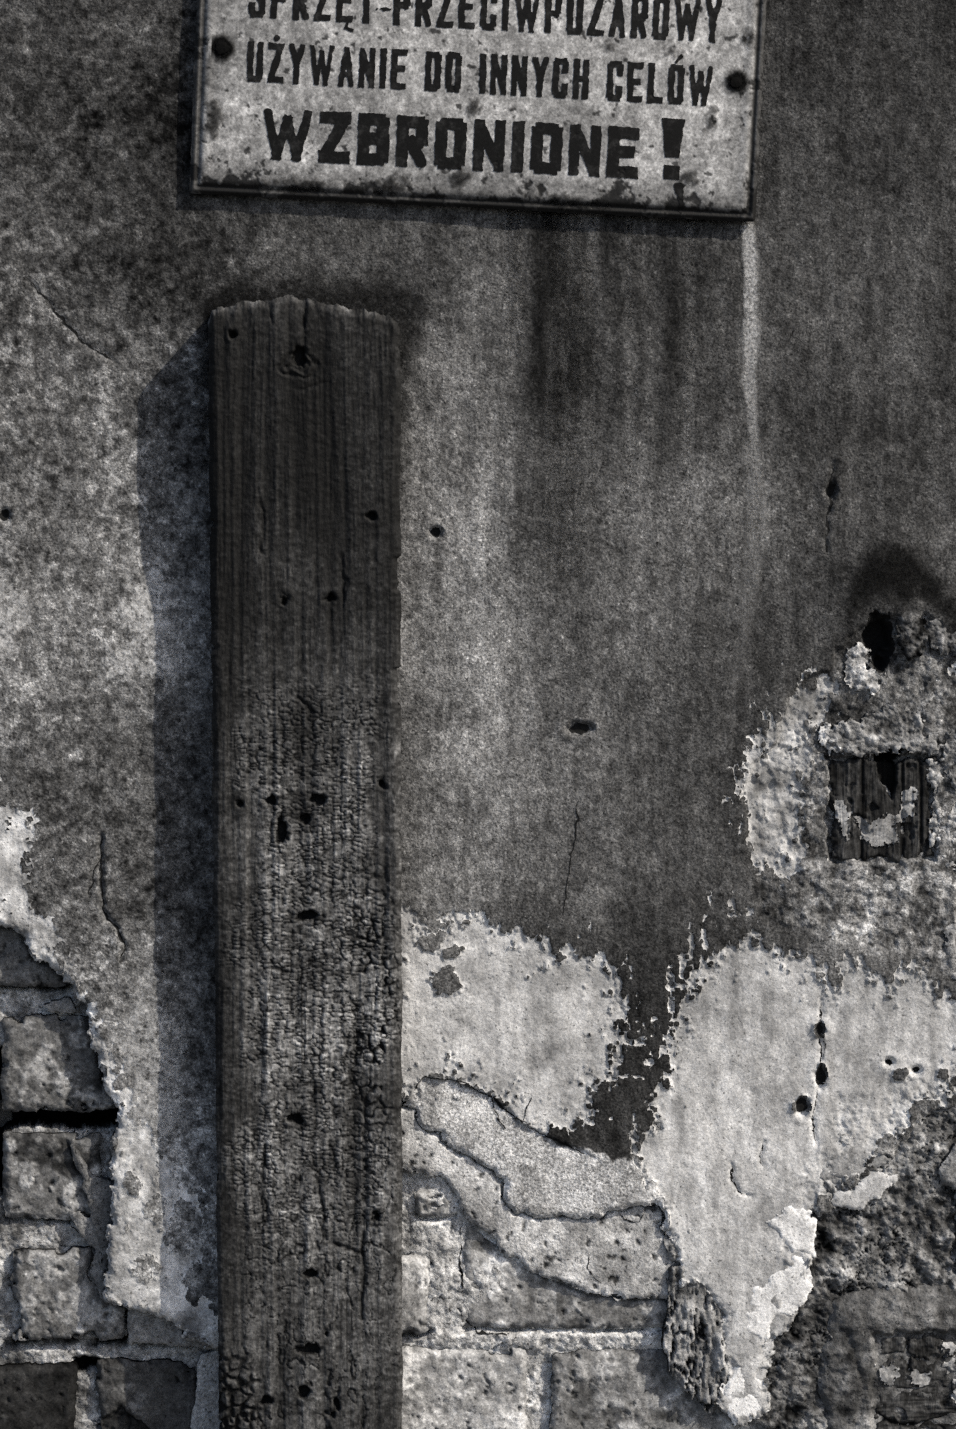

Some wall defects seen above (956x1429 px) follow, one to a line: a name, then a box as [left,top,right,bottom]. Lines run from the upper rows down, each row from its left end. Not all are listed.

water stain [529,212,561,416]
water stain [743,223,759,466]
spalling [569,723,589,734]
flaking render [722,610,956,892]
flaking render [0,792,219,1350]
flaking render [401,890,956,1429]